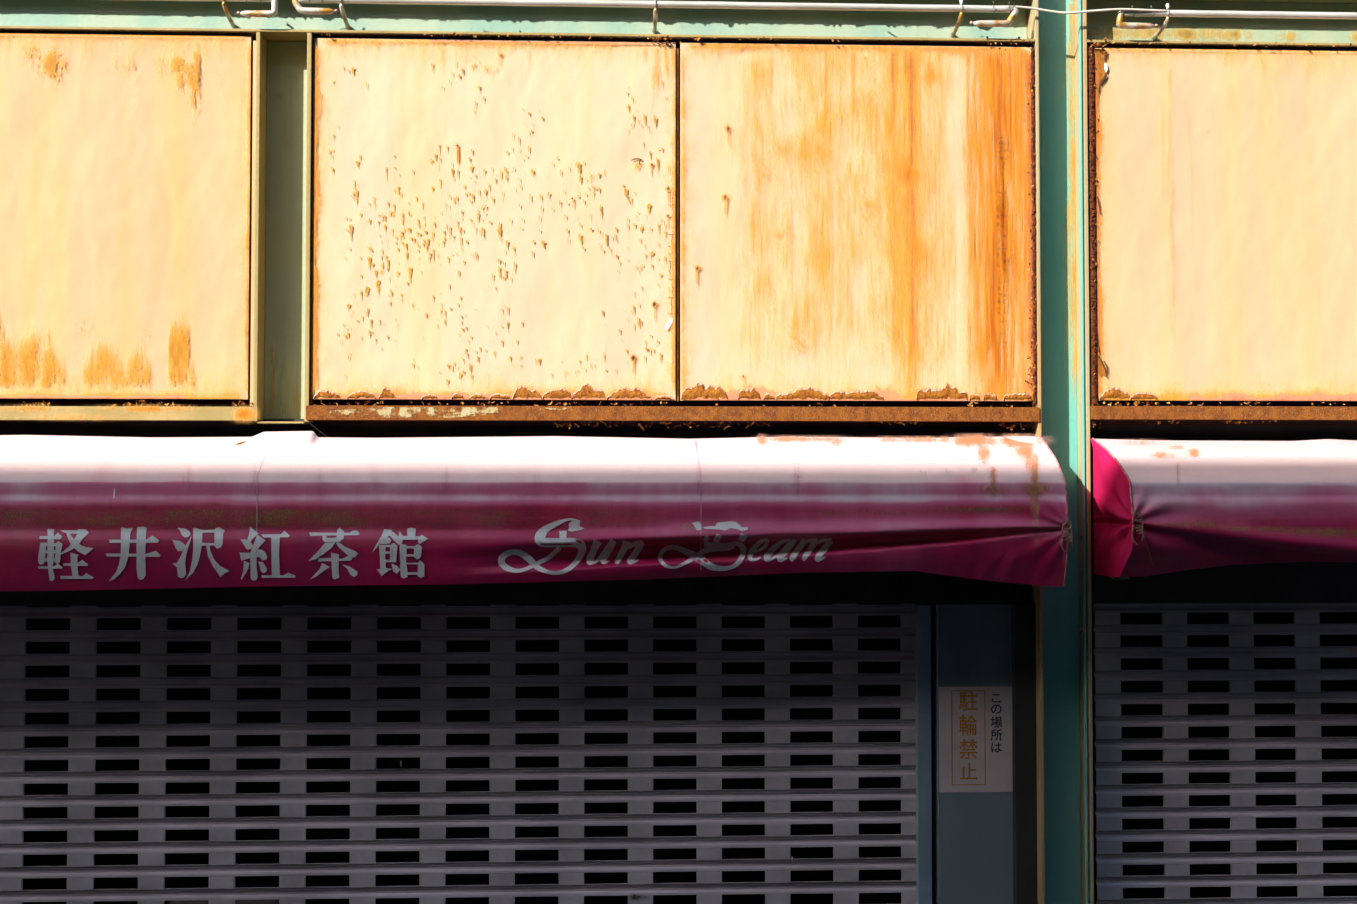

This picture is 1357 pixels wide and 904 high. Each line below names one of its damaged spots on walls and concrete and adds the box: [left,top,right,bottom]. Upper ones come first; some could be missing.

rust [0,33,254,420]
rust [313,28,1044,405]
rust [1066,4,1357,404]